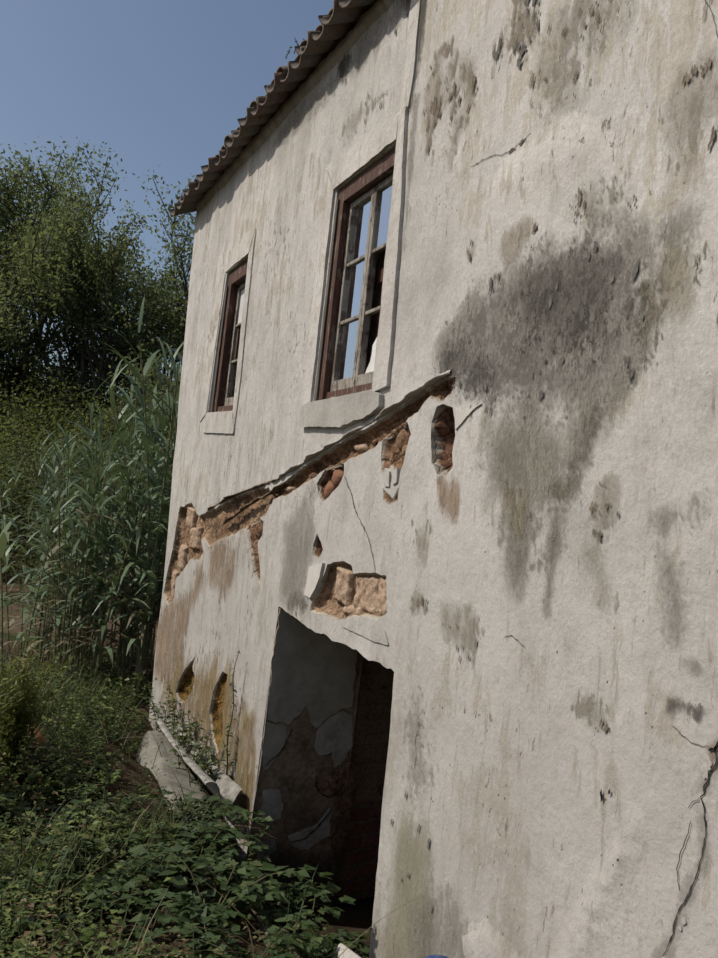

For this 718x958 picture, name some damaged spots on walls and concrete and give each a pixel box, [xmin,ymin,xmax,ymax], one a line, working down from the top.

water stain [434,192,707,607]
flaking render [163,377,482,605]
flaking render [304,534,389,645]
peeling [410,590,427,614]
flaking render [176,656,196,705]
flaking render [209,672,228,753]
crack [661,726,718,958]